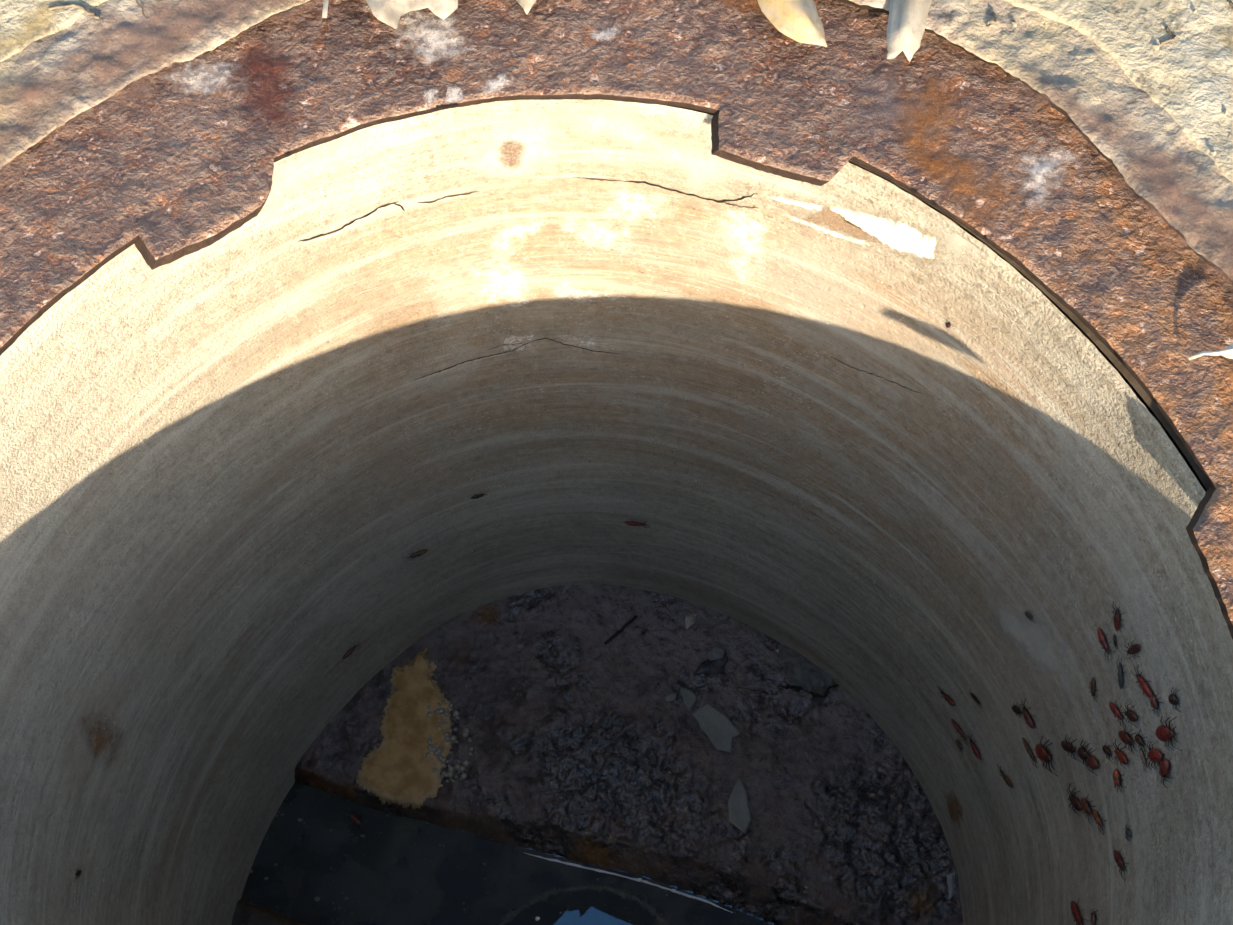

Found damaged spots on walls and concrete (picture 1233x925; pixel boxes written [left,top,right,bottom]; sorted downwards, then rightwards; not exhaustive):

corrosion [0,0,324,176]
crack [298,192,474,245]
damp [471,217,543,306]
damp [555,282,625,301]
damp [564,189,667,248]
crack [573,177,757,208]
damp [719,211,766,280]
spalling [767,195,939,263]
crack [410,337,614,382]
corrosion [356,648,453,810]